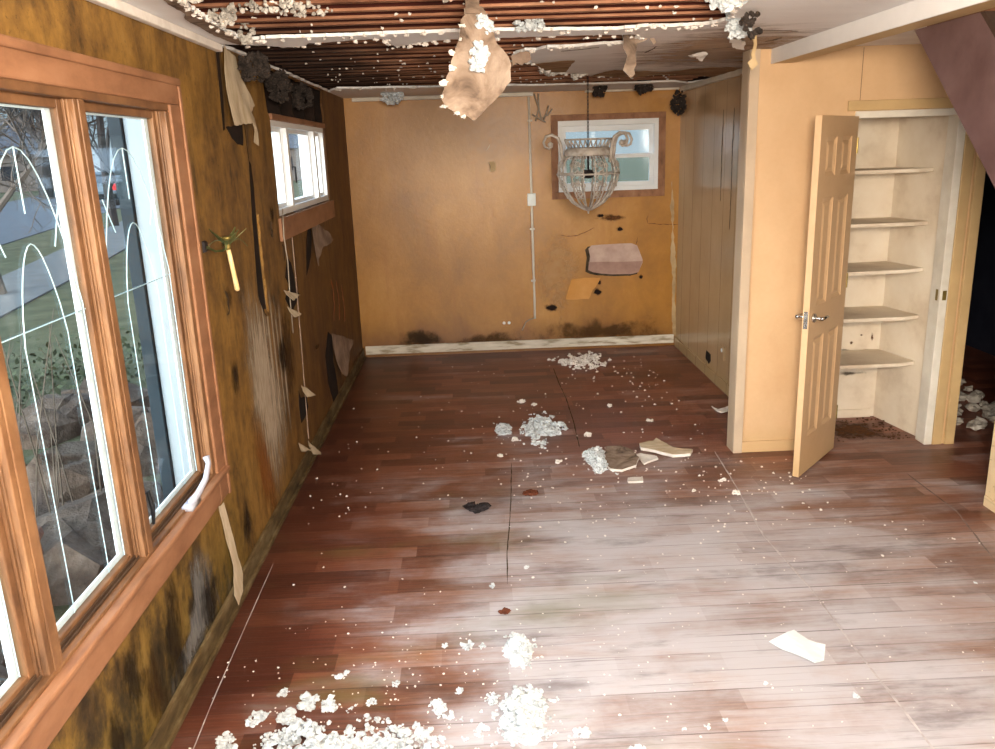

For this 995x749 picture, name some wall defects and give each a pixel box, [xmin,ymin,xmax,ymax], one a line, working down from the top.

spalling [510,24,718,74]
peeling [729,38,746,50]
peeling [170,0,270,146]
spalling [281,24,466,119]
peeling [332,333,354,376]
mould [406,331,439,345]
damp [469,334,512,342]
damp [563,321,631,338]
damp [166,559,216,682]
damp [125,652,163,716]
damp [111,720,125,749]